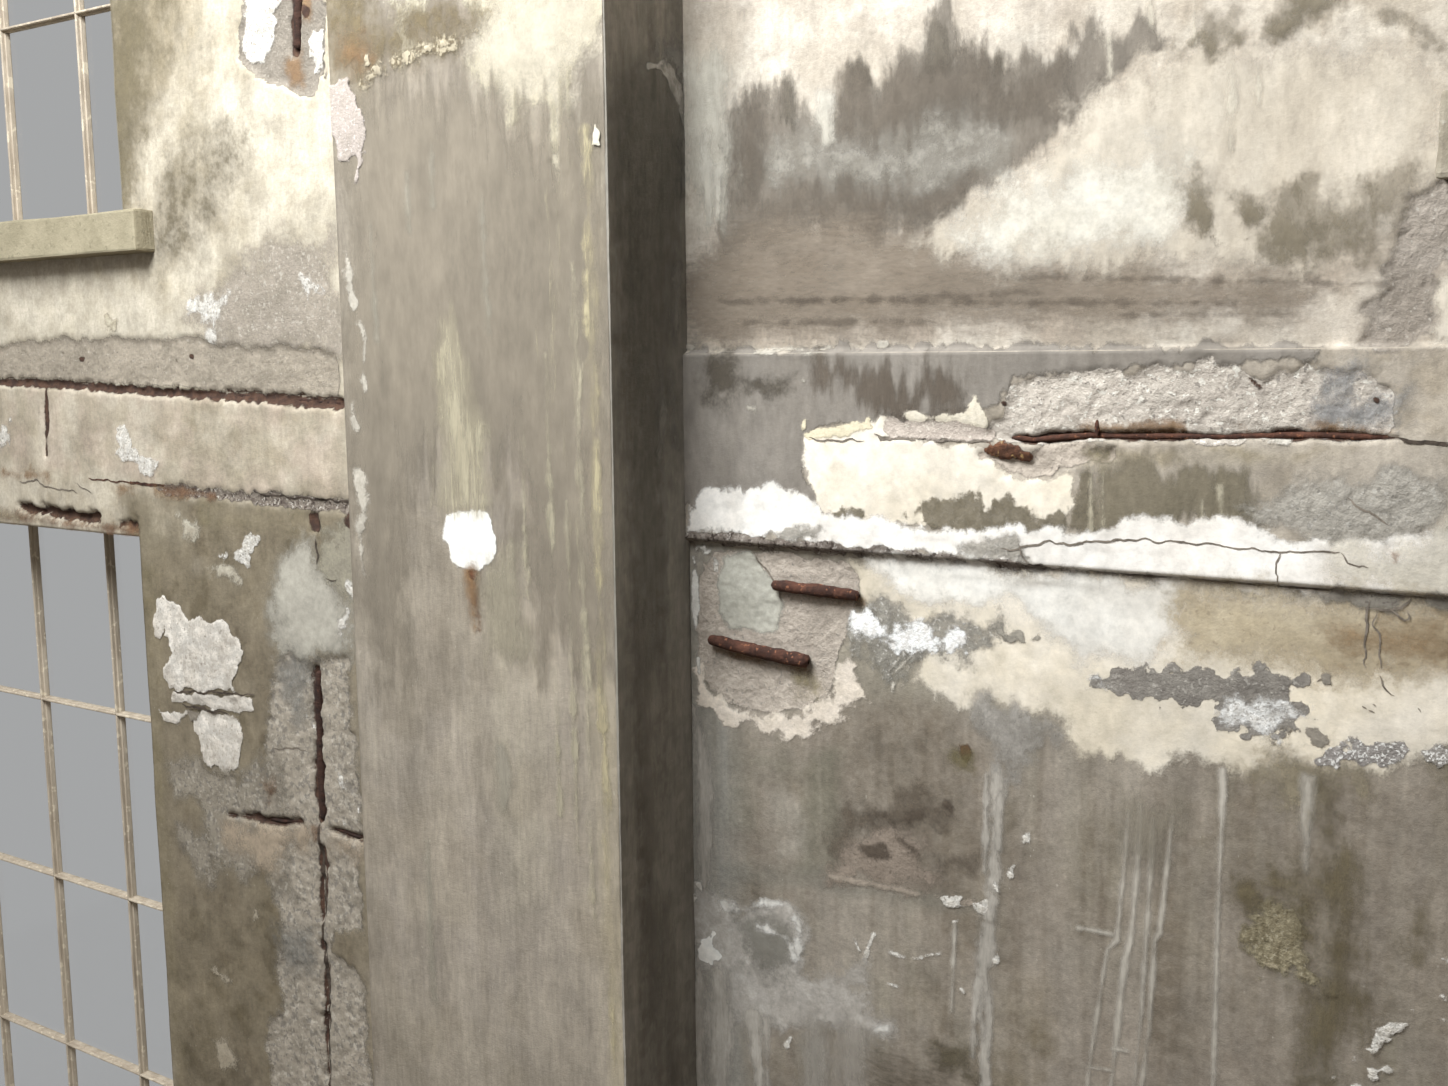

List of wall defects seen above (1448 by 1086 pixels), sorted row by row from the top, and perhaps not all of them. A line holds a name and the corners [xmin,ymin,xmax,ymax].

spalling [238,0,366,184]
flaking render [460,0,602,175]
water stain [657,0,1393,519]
corrosion [0,377,345,456]
corrosion [464,569,478,616]
flaking render [685,531,1448,808]
water stain [905,455,1259,533]
spalling [801,356,1448,531]
crack [1001,537,1340,553]
spalling [1248,464,1446,546]
spalling [153,595,374,1086]
peeling [1351,1022,1408,1086]